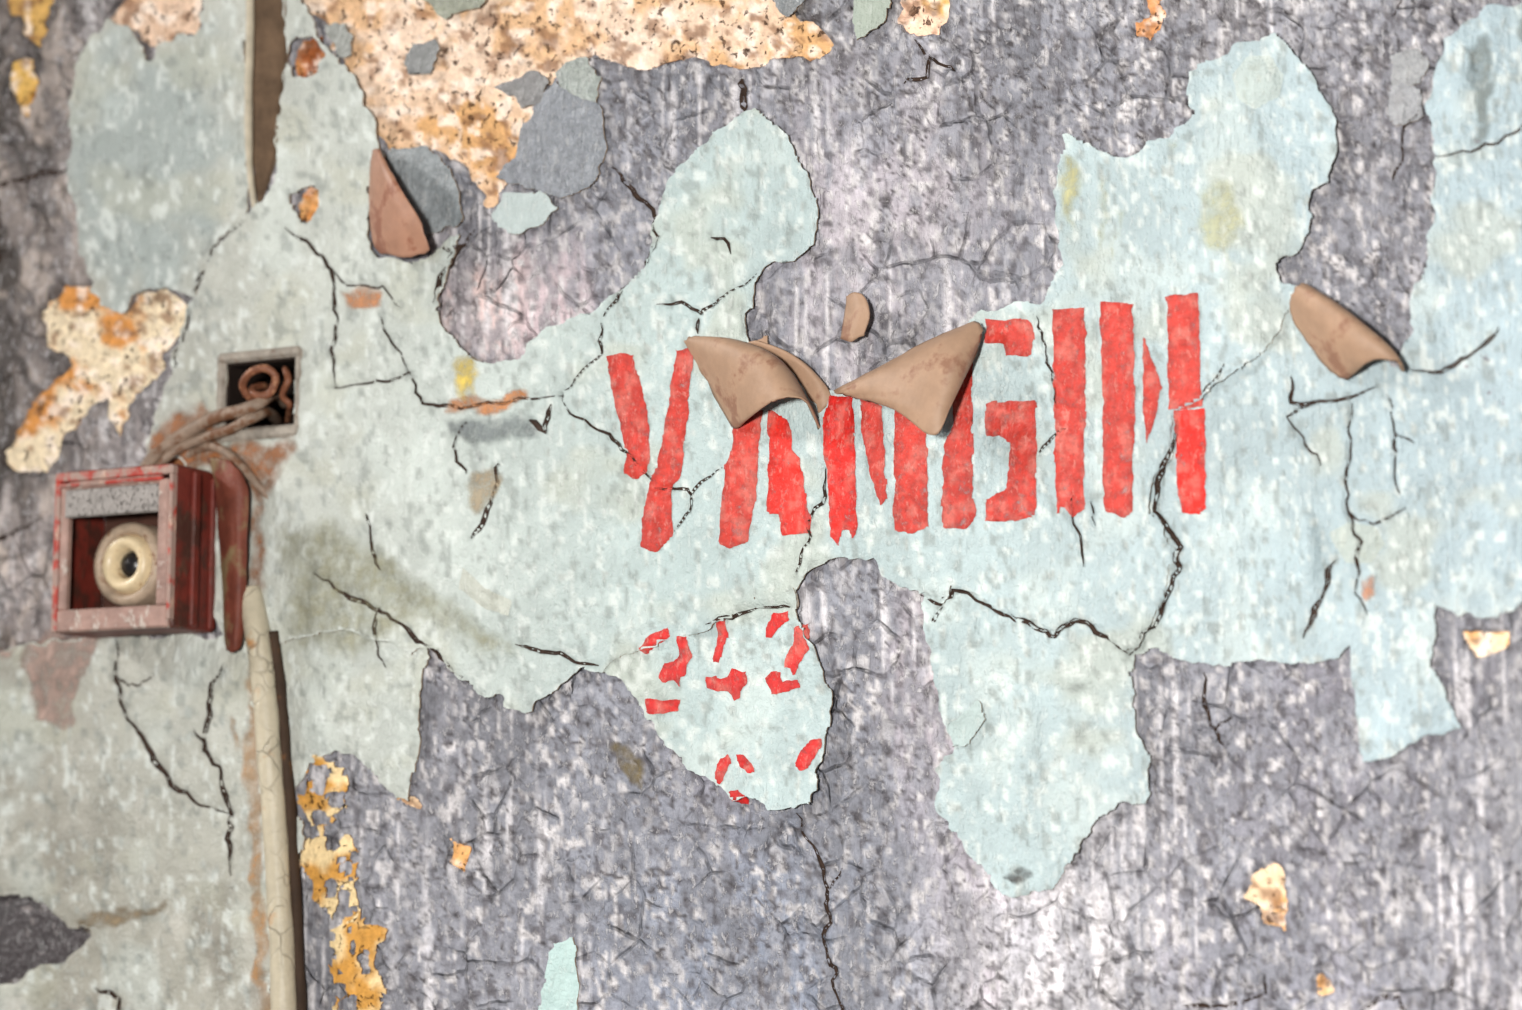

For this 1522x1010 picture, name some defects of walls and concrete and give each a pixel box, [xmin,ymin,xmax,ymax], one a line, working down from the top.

peeling [5,0,1338,826]
peeling [921,3,1522,898]
peeling [0,509,271,1010]
crack [114,640,234,876]
spalling [297,810,388,1010]
spalling [450,838,472,872]
peeling [538,937,580,1010]
crack [796,813,844,1010]
crack [1202,673,1232,746]
crack [1183,973,1267,1009]
spalling [1244,863,1288,931]
crack [1361,994,1405,1010]